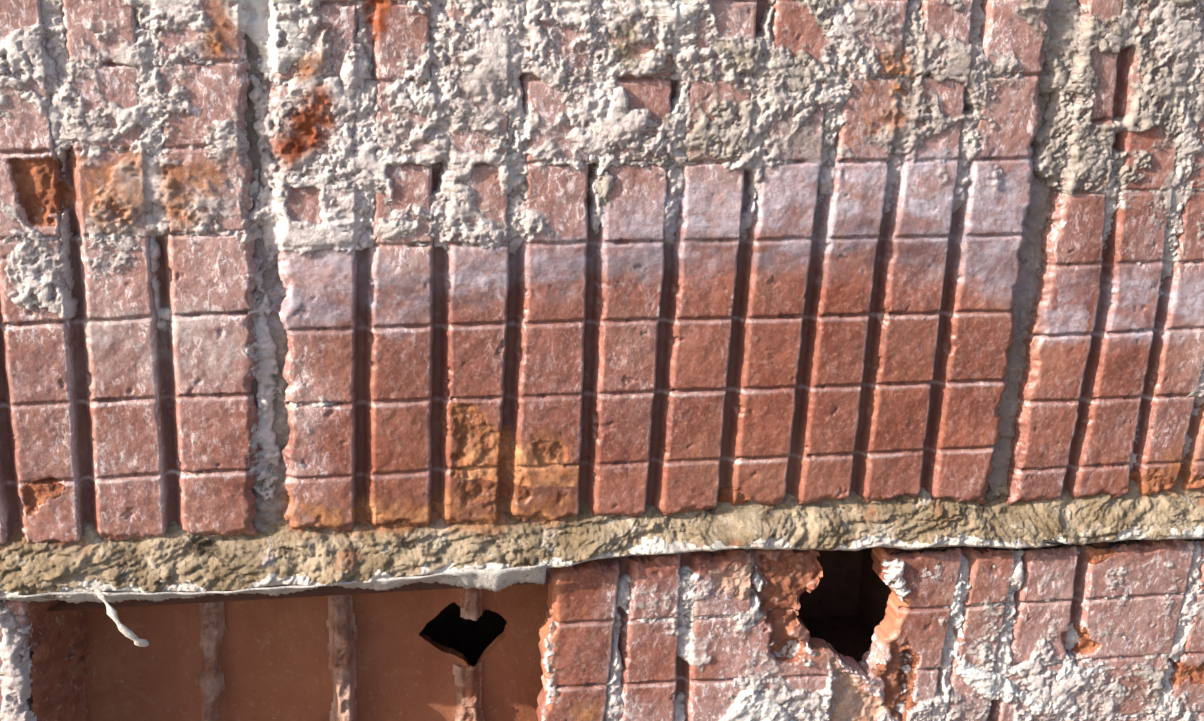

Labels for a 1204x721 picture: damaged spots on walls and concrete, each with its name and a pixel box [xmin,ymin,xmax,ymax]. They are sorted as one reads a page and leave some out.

peeling [532,436,570,468]
crack [890,538,1204,555]
hole [797,548,892,663]